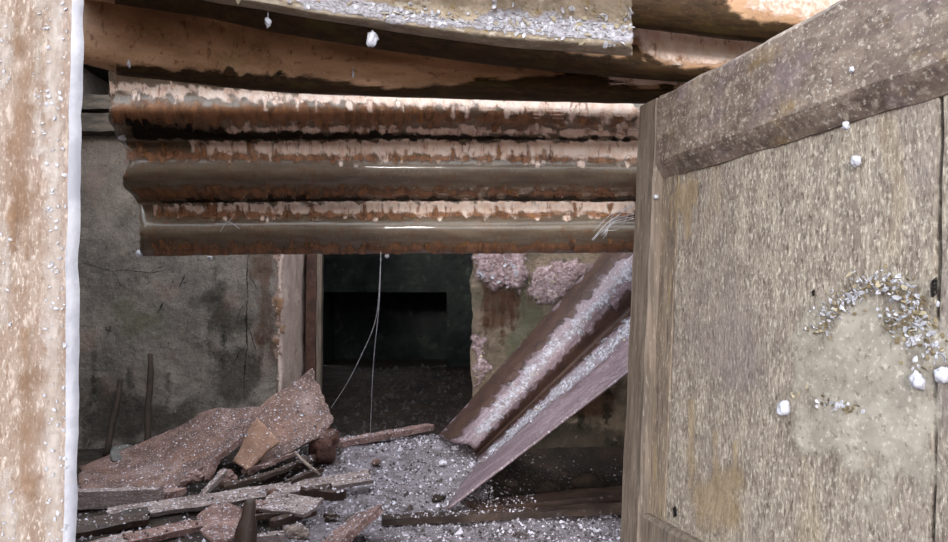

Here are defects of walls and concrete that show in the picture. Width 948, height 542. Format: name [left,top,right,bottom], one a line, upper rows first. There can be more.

corrosion [111,98,637,164]
corrosion [155,202,635,220]
crack [232,255,258,395]
corrosion [151,239,634,381]